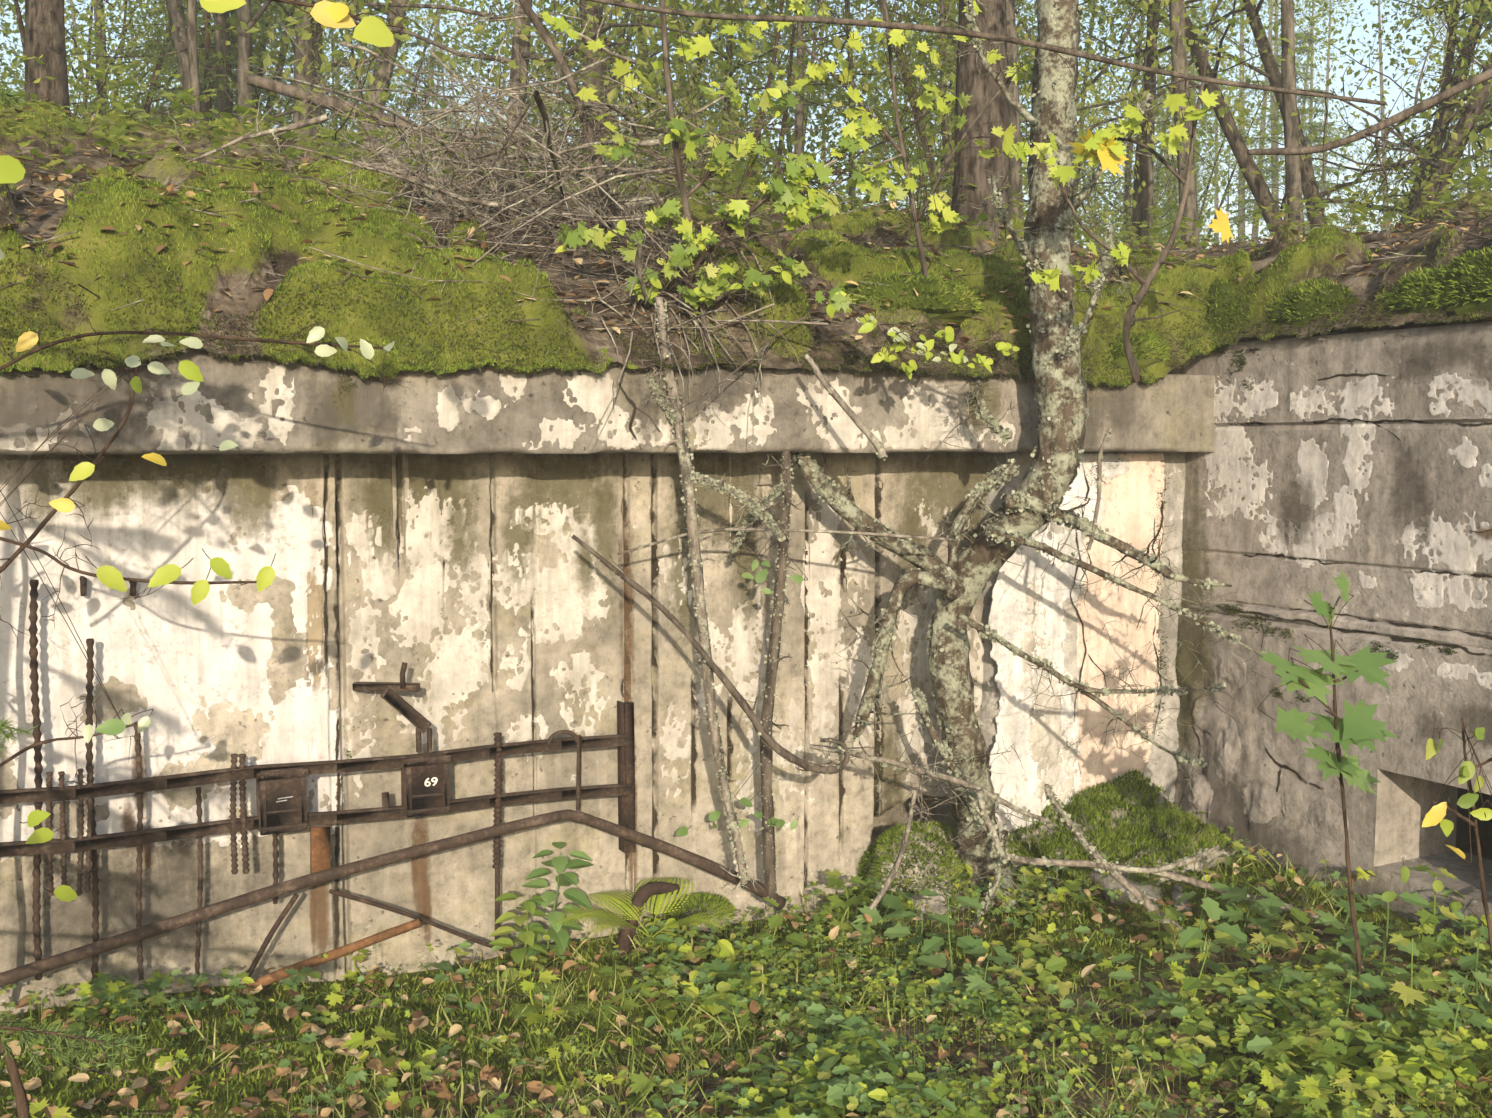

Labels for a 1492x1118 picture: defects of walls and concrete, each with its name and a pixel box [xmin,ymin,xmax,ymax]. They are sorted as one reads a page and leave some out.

peeling [522,368,777,450]
peeling [1427,365,1492,418]
peeling [1199,375,1394,570]
peeling [1447,436,1492,489]
peeling [0,364,611,863]
spalling [1017,453,1166,806]
peeling [1358,570,1377,589]
peeling [1395,511,1492,612]